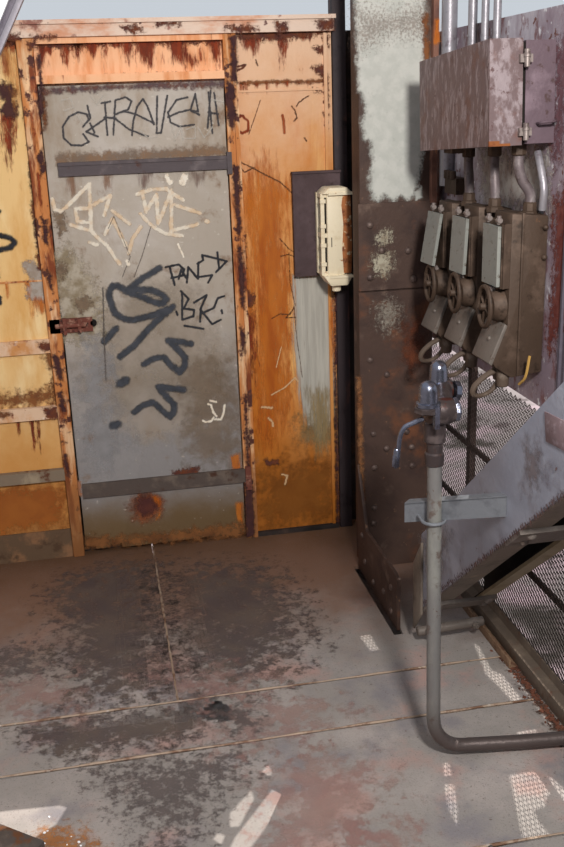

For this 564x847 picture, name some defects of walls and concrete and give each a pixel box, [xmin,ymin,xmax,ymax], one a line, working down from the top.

peeling [354,0,426,202]
corrosion [0,18,336,294]
peeling [372,230,395,278]
corrosion [232,165,295,447]
corrosion [0,342,67,449]
corrosion [231,398,251,469]
corrosion [172,465,200,475]
corrosion [84,480,255,549]
leakage [0,555,323,847]
corrosion [504,663,564,731]
corrosion [38,826,101,847]